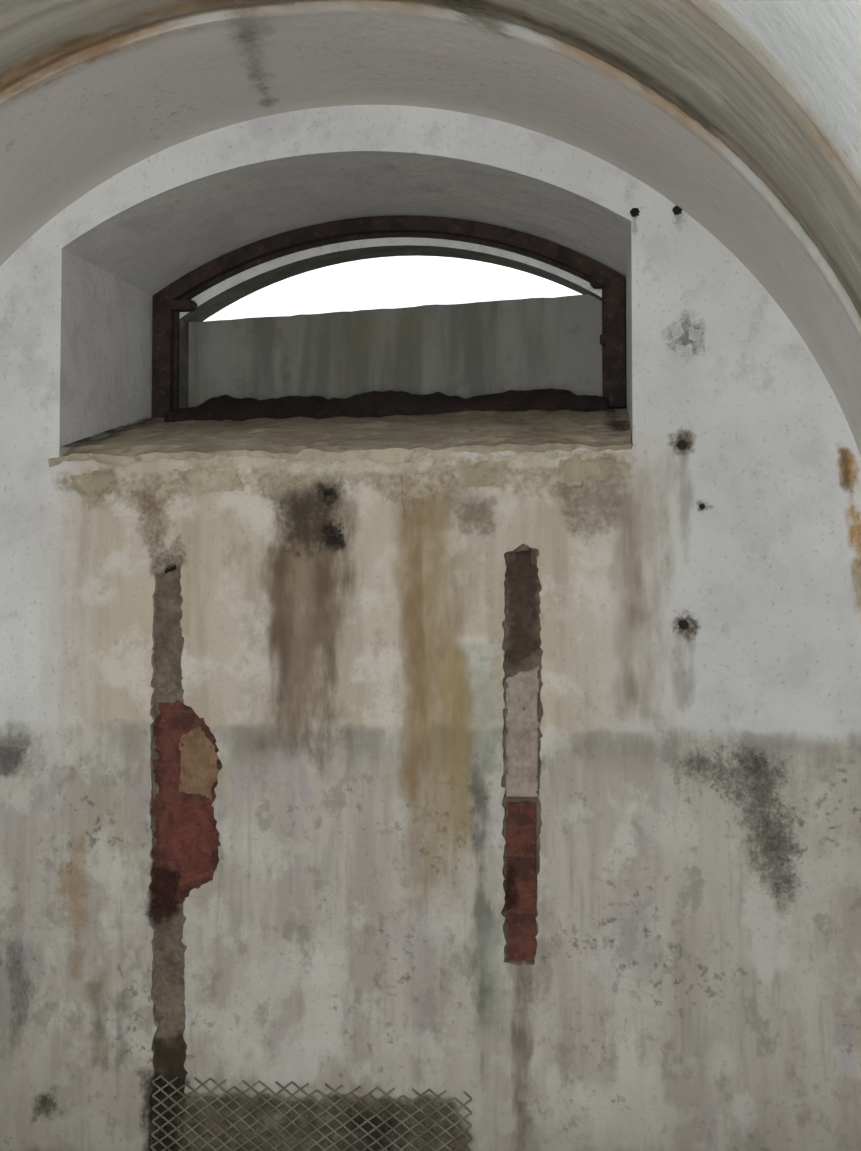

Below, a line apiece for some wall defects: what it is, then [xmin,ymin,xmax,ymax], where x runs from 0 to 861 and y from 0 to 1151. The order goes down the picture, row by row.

peeling [149,536,186,572]
water stain [273,483,349,738]
rust [840,449,856,485]
rust [850,505,861,564]
flaking render [146,700,222,924]
flaking render [506,800,537,962]